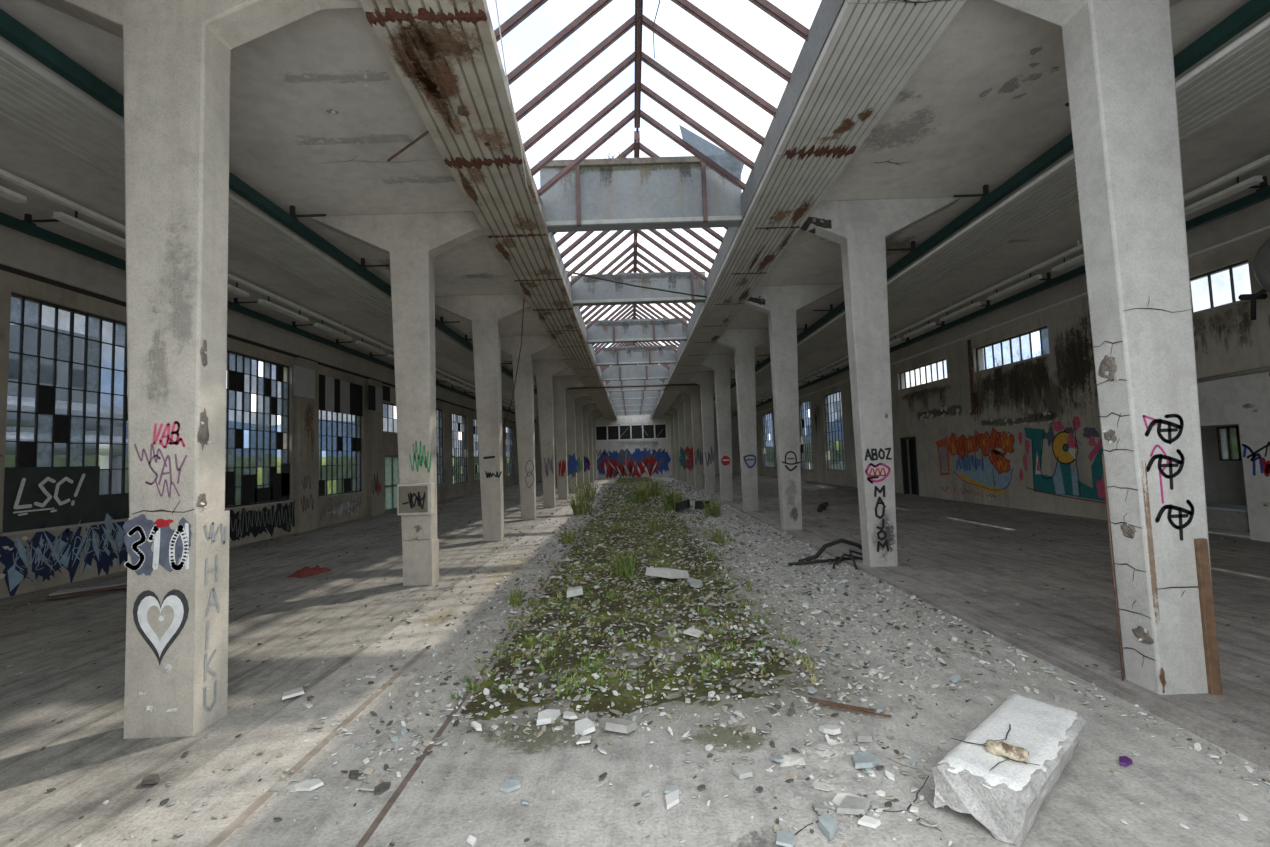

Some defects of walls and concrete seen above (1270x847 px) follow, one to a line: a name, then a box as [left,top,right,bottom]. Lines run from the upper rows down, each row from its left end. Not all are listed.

corrosion [365,0,525,201]
corrosion [782,108,872,161]
crack [1125,300,1191,313]
damp [975,318,1097,425]
crack [1094,341,1124,386]
crack [1073,412,1132,494]
crack [1110,486,1140,528]
crack [1114,563,1198,619]